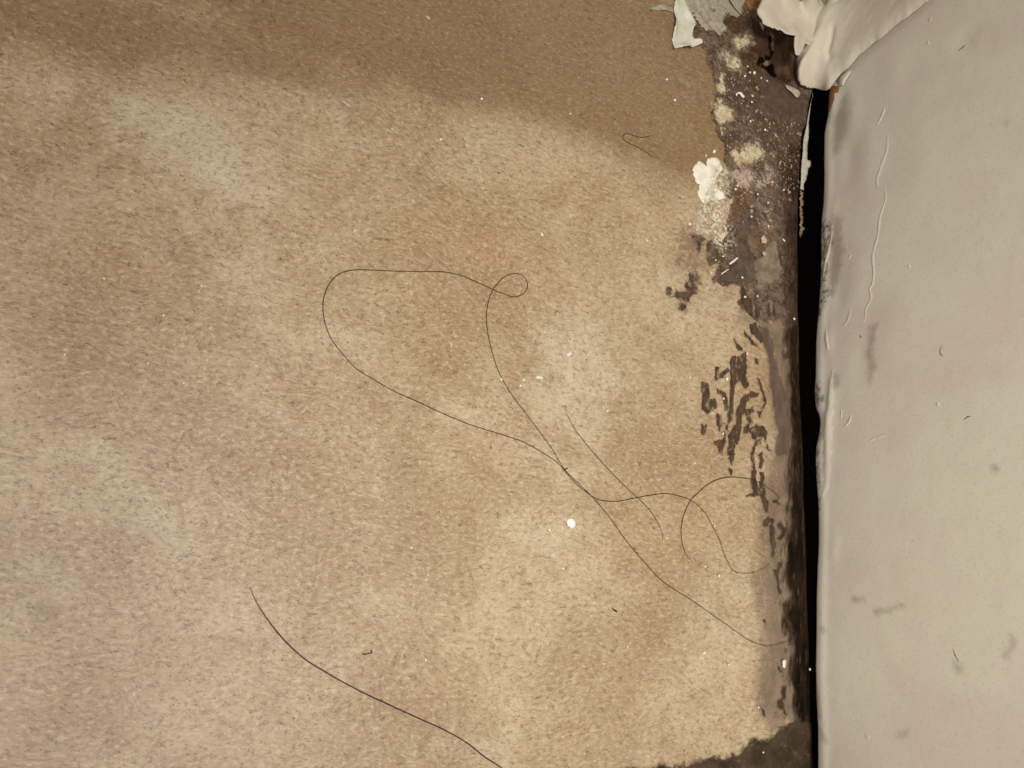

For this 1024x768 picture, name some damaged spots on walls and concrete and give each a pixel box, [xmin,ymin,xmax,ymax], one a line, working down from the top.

peeling [648,0,703,48]
peeling [717,0,745,16]
peeling [757,0,928,237]
water stain [658,2,813,768]